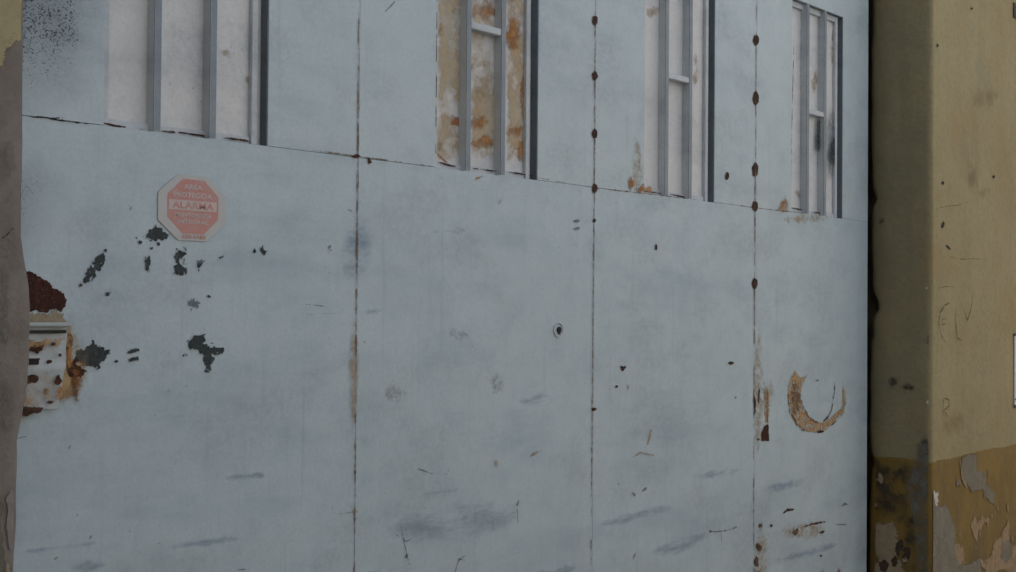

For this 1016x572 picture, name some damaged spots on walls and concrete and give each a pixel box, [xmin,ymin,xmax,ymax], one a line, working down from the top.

corrosion [328,84,387,190]
corrosion [746,152,802,242]
corrosion [26,271,67,313]
peeling [79,249,107,287]
peeling [136,224,169,271]
peeling [173,247,205,275]
corrosion [22,327,83,416]
peeling [66,340,139,400]
peeling [183,334,224,373]
corrosion [754,388,770,441]
corrosion [788,371,846,433]
flaking render [874,521,911,572]